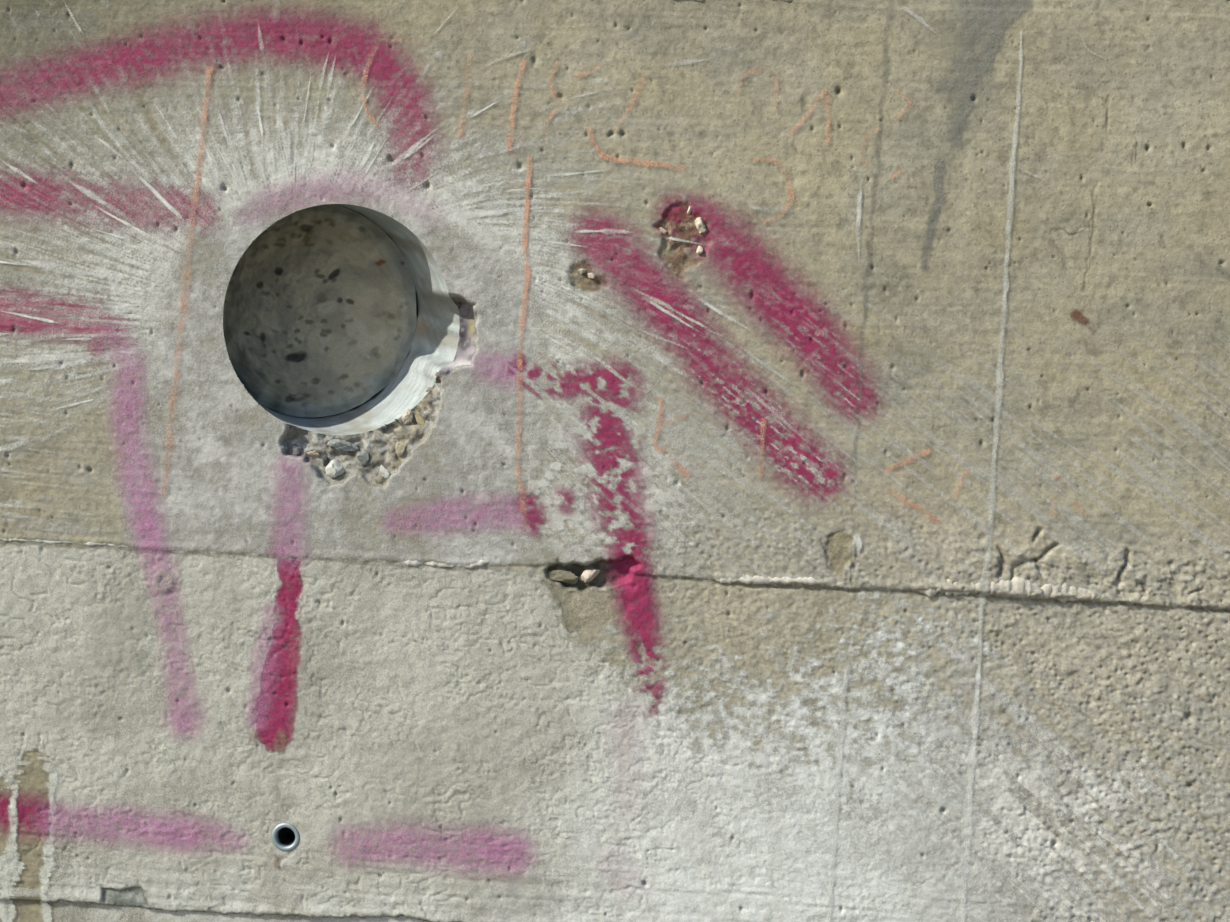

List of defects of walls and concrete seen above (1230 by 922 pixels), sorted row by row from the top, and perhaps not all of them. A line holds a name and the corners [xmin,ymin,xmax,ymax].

water stain [939,0,1030,149]
water stain [0,149,56,182]
water stain [397,138,430,161]
water stain [1005,33,1023,236]
spalling [658,204,707,277]
water stain [922,161,945,269]
water stain [3,308,54,323]
spalling [284,298,477,486]
water stain [724,388,830,483]
water stain [965,321,1004,525]
peeling [546,559,625,633]
spalling [825,532,862,575]